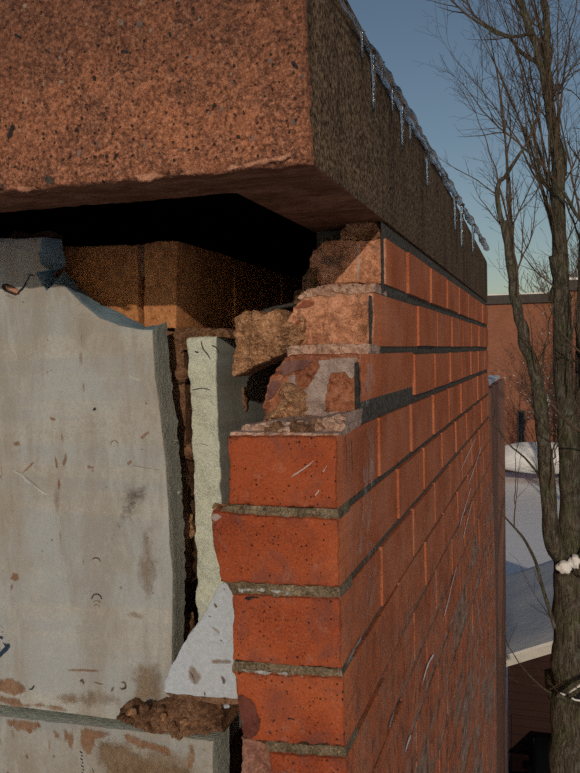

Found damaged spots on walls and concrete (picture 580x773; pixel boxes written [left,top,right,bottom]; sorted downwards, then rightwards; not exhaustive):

corrosion [0,679,62,710]
corrosion [8,720,40,733]
corrosion [54,729,106,754]
corrosion [125,735,169,755]